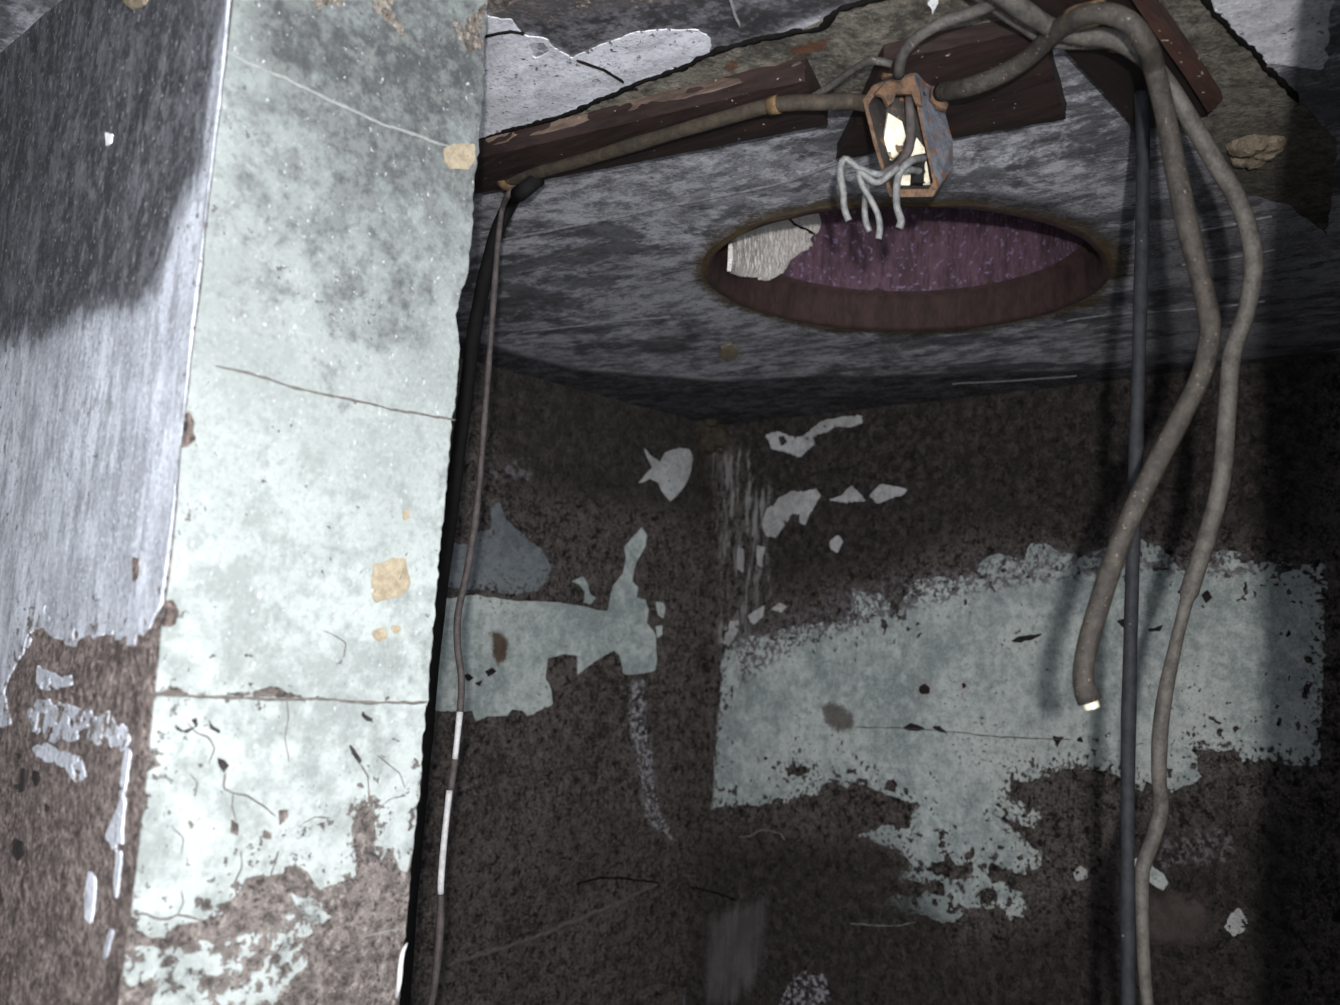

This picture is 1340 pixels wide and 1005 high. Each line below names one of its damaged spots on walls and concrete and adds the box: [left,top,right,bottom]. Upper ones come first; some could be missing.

crack [215,365,455,421]
peeling [0,0,1000,1005]
peeling [711,450,1328,923]
crack [149,692,428,896]
crack [132,890,199,920]
peeling [1224,908,1248,936]